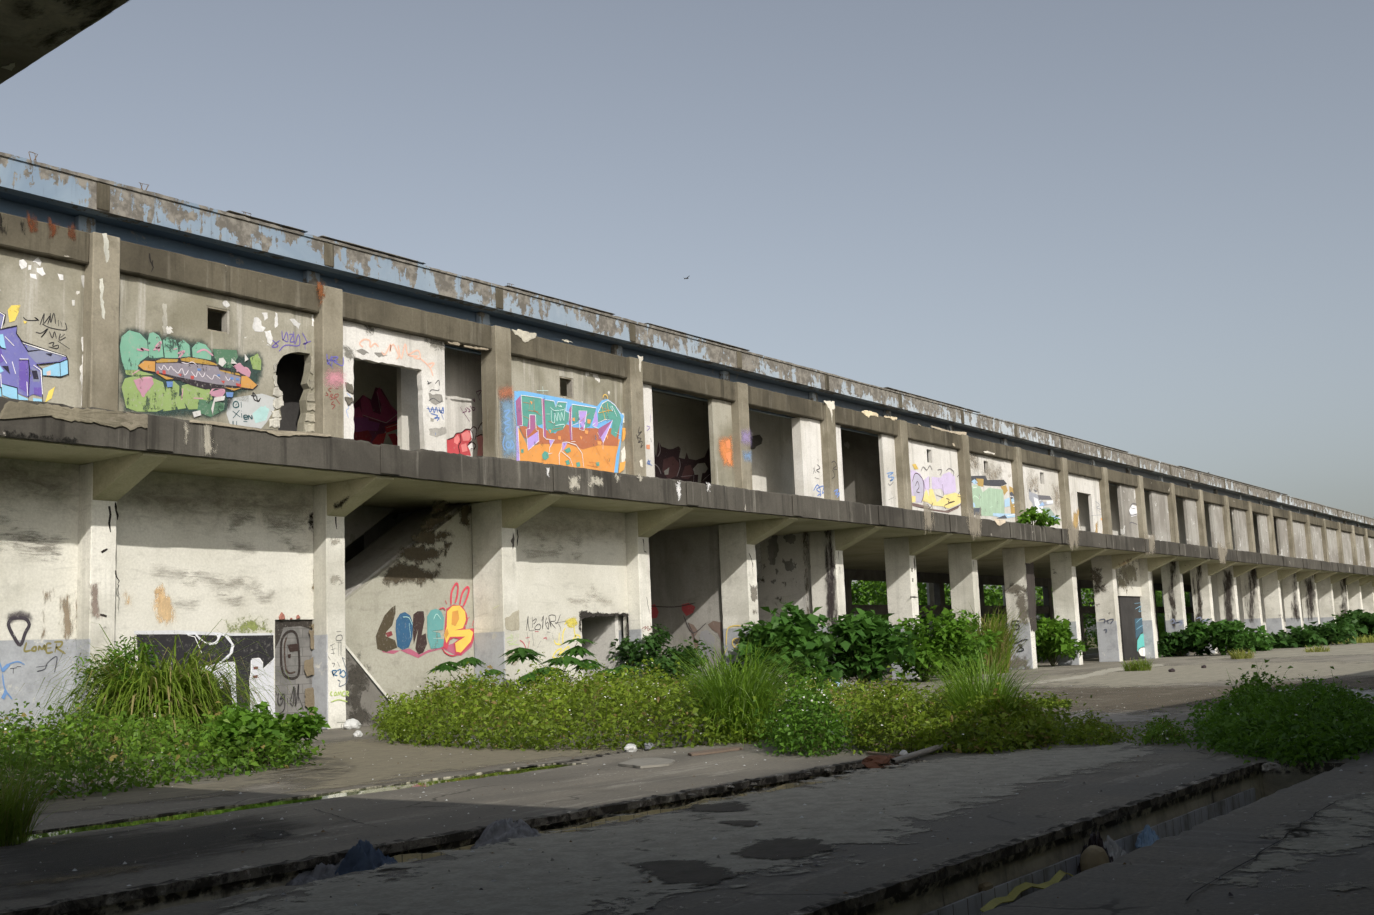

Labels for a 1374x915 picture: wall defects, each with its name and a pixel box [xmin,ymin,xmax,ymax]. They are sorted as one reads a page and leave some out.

mould [37,0,116,47]
peeling [19,257,63,280]
peeling [72,233,109,319]
spalling [512,329,536,342]
spalling [189,312,333,437]
peeling [429,393,447,437]
spalling [862,410,897,420]
leakage [383,500,472,586]